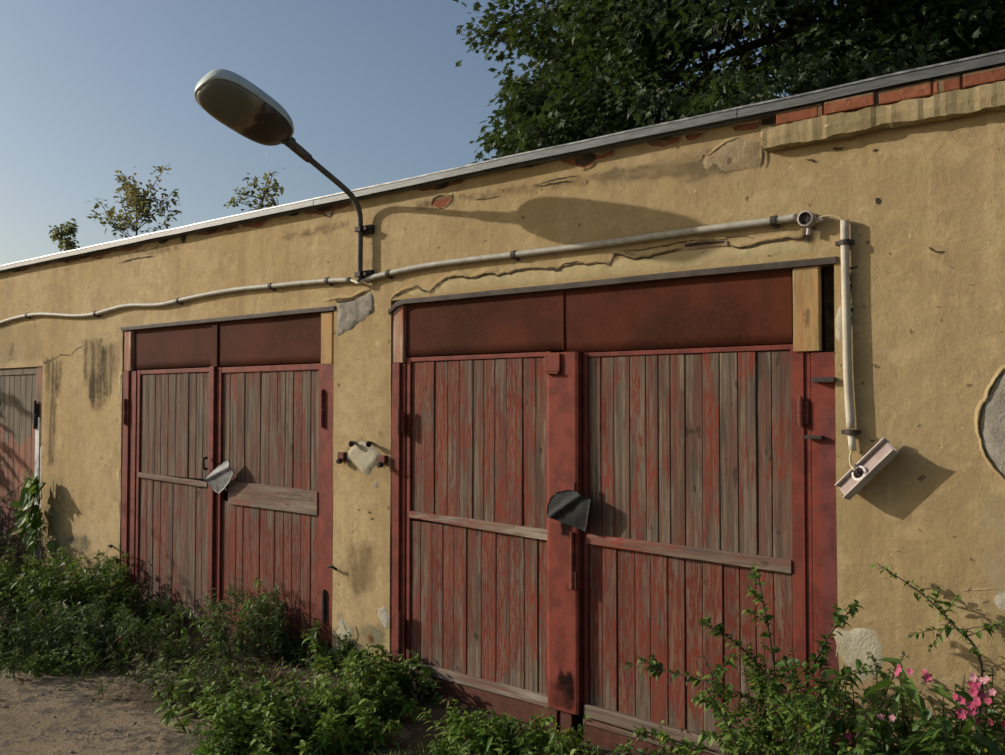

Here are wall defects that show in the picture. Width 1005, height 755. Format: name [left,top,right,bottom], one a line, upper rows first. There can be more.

spalling [644,117,777,173]
spalling [394,178,467,210]
crack [726,230,804,249]
crack [390,240,695,301]
leakage [84,343,111,406]
spalling [974,365,1005,484]